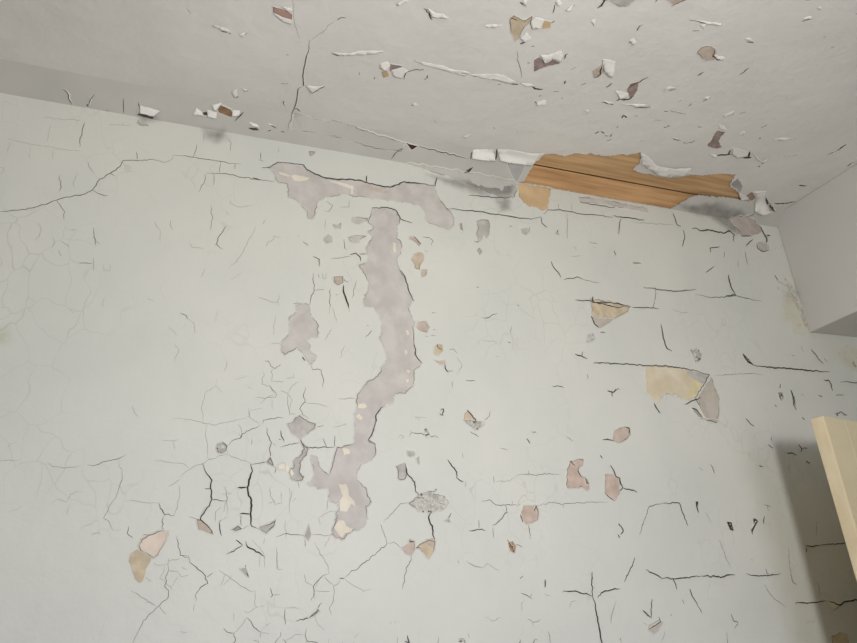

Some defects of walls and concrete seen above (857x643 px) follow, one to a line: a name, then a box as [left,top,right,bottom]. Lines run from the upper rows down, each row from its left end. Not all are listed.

crack [0,89,438,244]
spalling [193,102,260,130]
crack [267,1,345,132]
peeling [406,162,552,212]
peeling [533,50,567,72]
crack [52,243,451,643]
peeling [267,150,464,541]
crack [414,312,475,381]
crack [470,427,699,552]
peeling [589,298,631,328]
peeling [643,366,721,424]
crack [518,505,857,643]